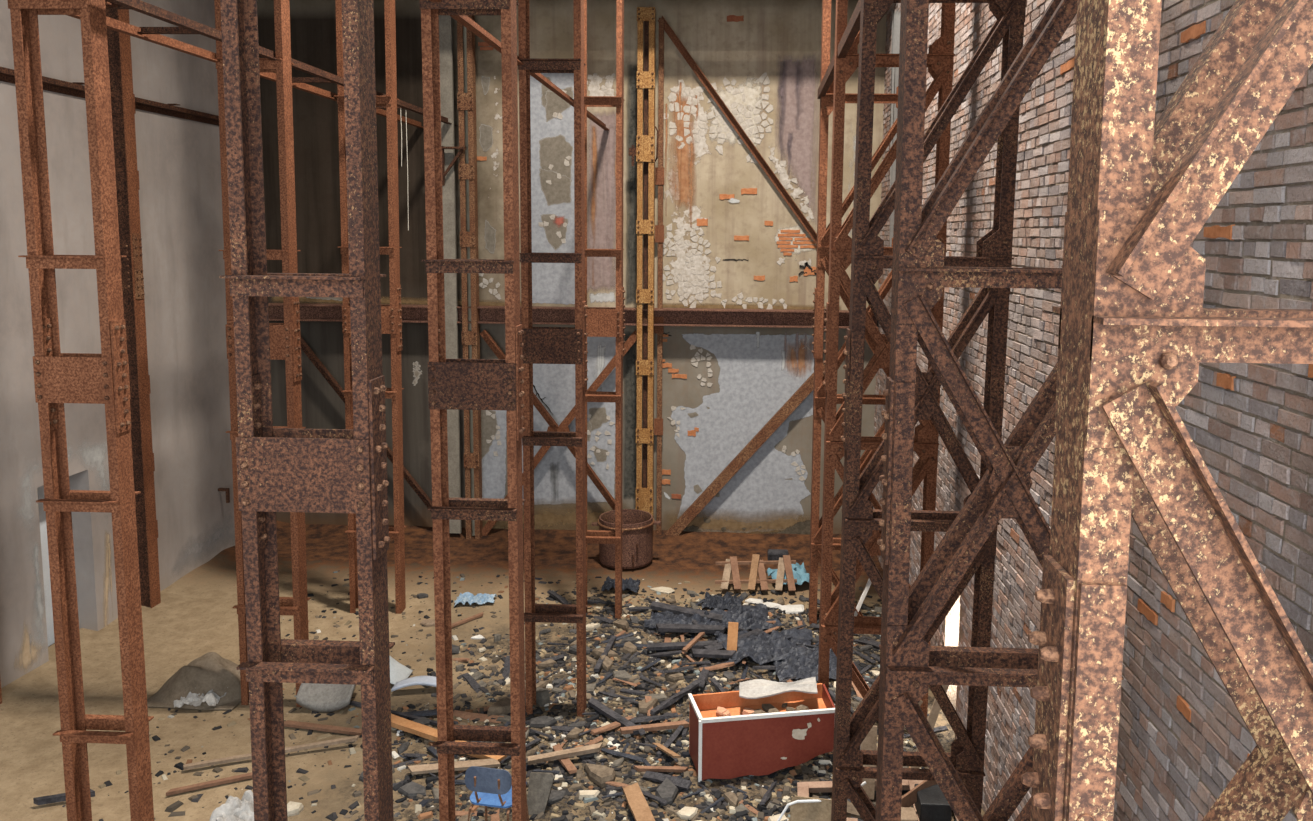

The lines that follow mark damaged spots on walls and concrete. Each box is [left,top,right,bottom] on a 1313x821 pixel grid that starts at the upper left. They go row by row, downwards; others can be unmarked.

peeling [530,73,616,305]
peeling [663,72,817,309]
peeling [662,333,814,532]